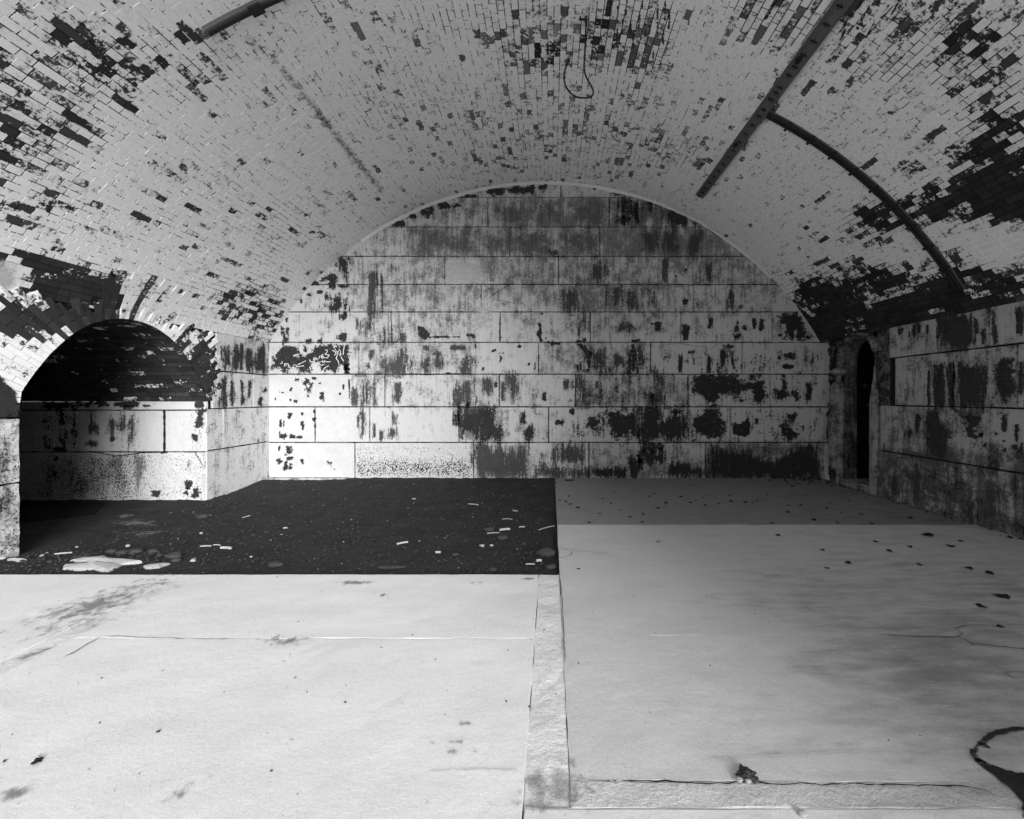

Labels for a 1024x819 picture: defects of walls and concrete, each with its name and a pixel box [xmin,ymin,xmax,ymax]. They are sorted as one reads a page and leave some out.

peeling [922,110,1024,226]
peeling [854,202,892,230]
peeling [0,249,104,306]
damp [367,264,384,329]
damp [1013,306,1024,336]
damp [349,371,403,442]
damp [449,368,520,411]
damp [563,342,667,410]
damp [897,307,999,462]
damp [22,411,143,522]
damp [469,435,824,478]
crack [579,779,991,793]